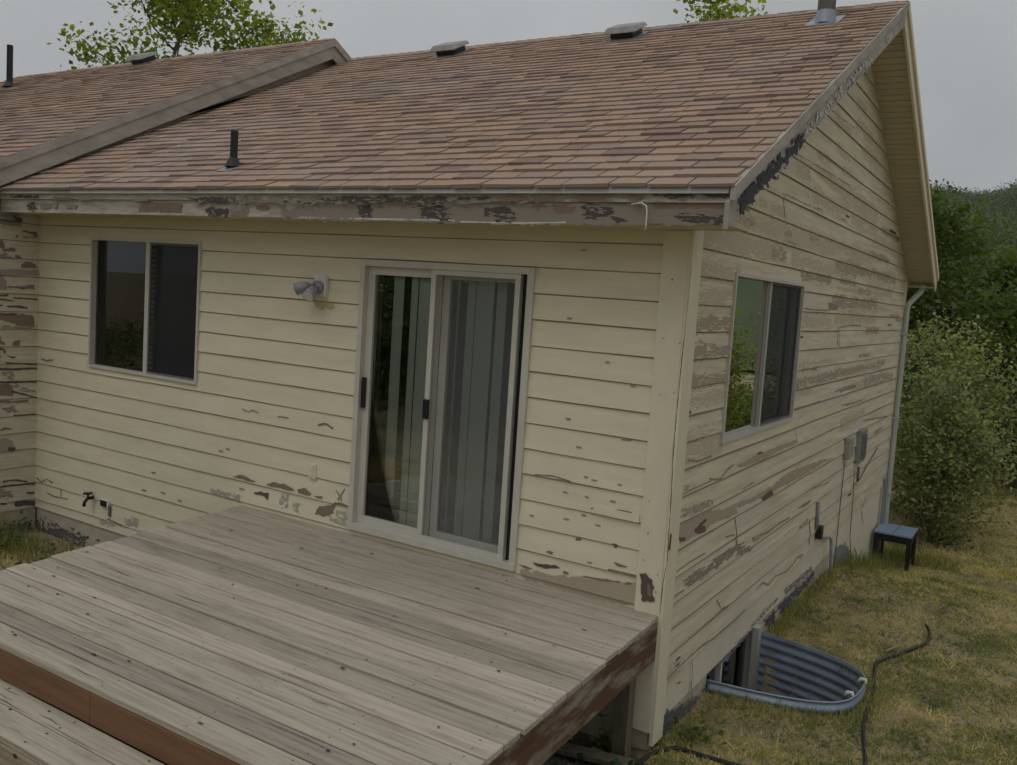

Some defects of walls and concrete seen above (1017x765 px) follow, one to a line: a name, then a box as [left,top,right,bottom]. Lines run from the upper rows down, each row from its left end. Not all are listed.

peeling [138,194,730,227]
peeling [0,207,40,290]
peeling [0,314,35,346]
peeling [0,383,36,403]
peeling [233,475,348,526]
peeling [679,458,832,544]
peeling [519,551,636,605]